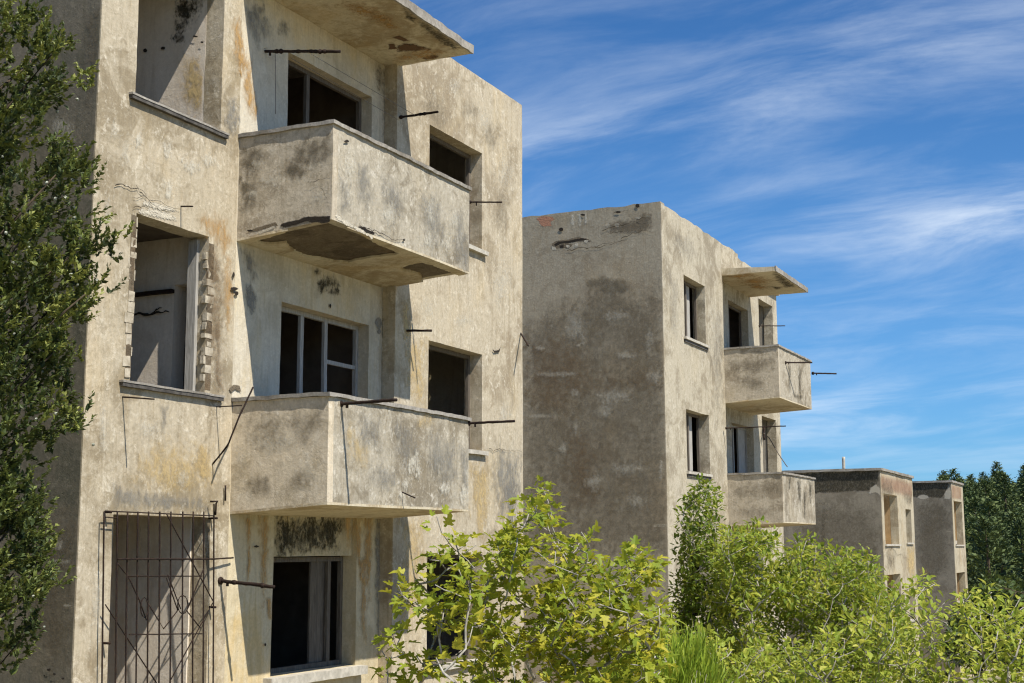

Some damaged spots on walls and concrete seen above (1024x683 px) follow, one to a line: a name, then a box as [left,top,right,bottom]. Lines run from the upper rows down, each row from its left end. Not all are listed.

mould [173,0,197,43]
corrosion [235,23,257,115]
crack [115,183,177,215]
spalling [247,215,375,239]
spalling [537,216,591,250]
mould [275,517,342,555]